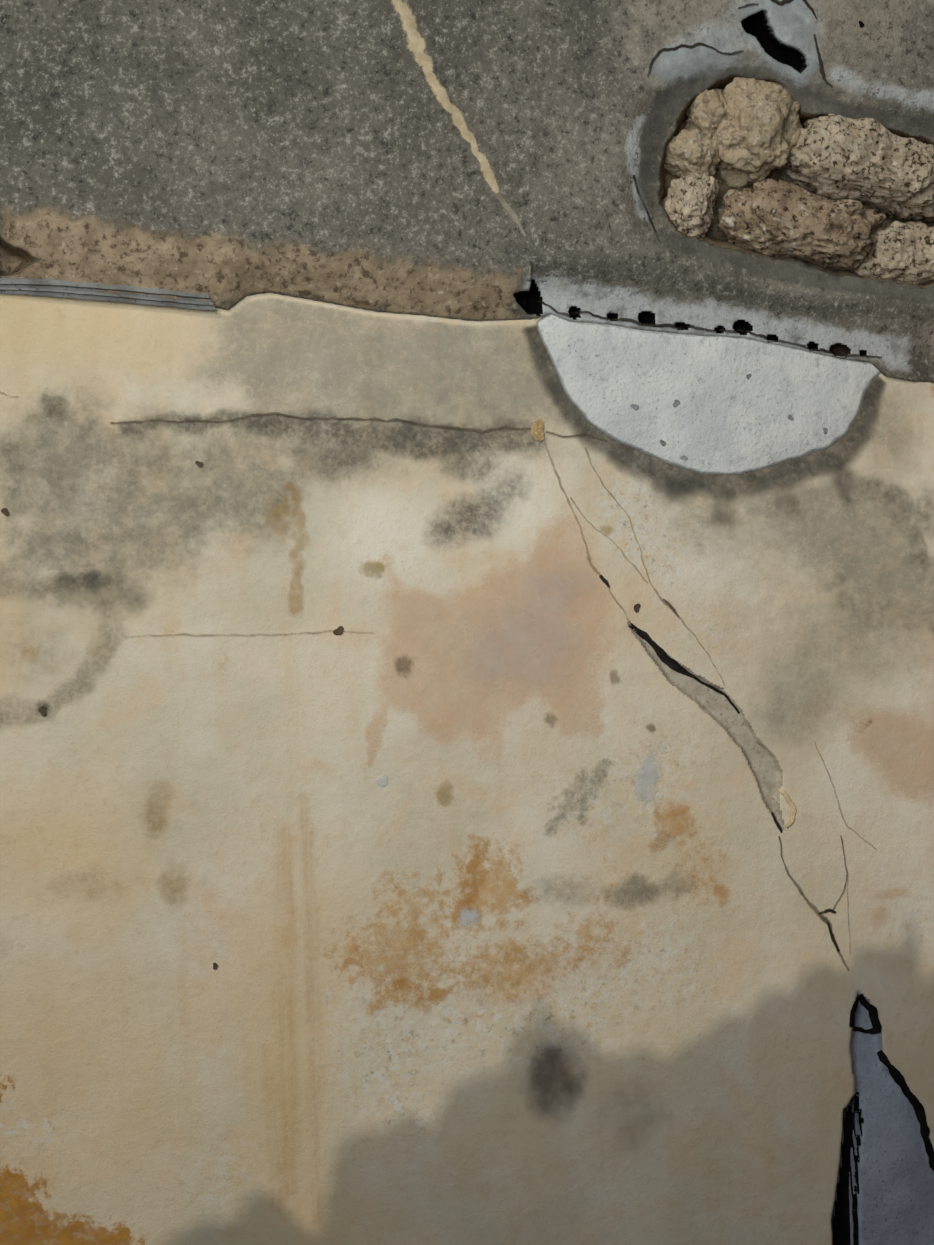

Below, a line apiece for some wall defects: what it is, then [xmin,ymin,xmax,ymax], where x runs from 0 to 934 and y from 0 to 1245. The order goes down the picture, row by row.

peeling [0,209,543,320]
crack [392,0,526,237]
flaking render [638,0,934,301]
damp [37,404,142,511]
crack [110,412,607,441]
crack [627,621,848,957]